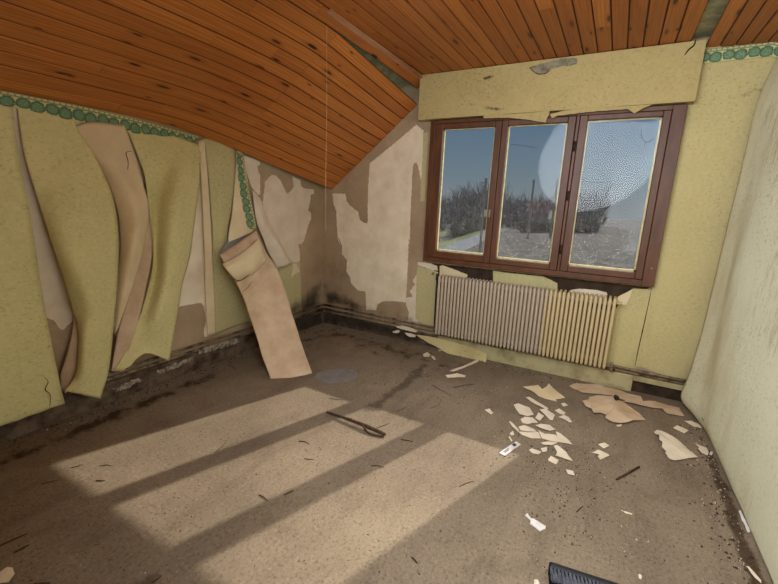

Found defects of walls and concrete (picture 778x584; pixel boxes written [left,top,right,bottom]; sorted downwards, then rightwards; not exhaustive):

peeling [530,58,577,75]
water stain [292,288,419,341]
peeling [157,338,239,374]
peeling [113,378,142,392]